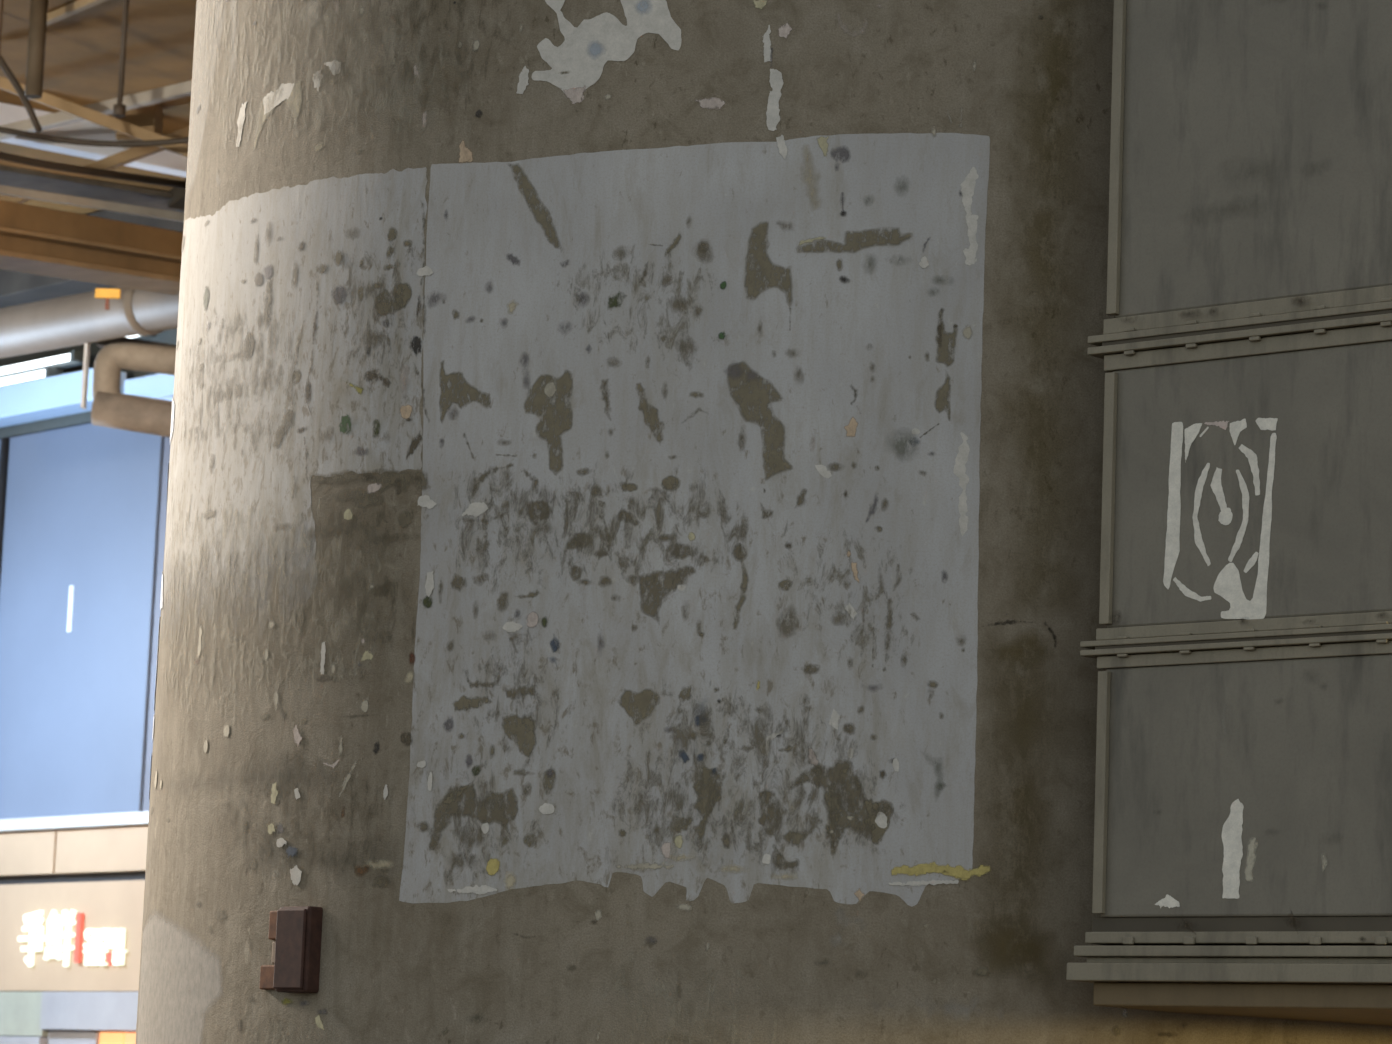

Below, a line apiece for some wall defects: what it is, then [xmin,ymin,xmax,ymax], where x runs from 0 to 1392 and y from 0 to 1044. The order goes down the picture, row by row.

peeling [516,0,682,105]
peeling [170,219,293,453]
peeling [317,217,433,355]
peeling [510,164,559,247]
peeling [728,362,792,492]
peeling [745,222,792,304]
peeling [798,193,929,282]
peeling [897,309,972,453]
peeling [423,355,748,660]
peeling [149,506,285,822]
peeling [417,664,555,895]
peeling [617,688,899,878]